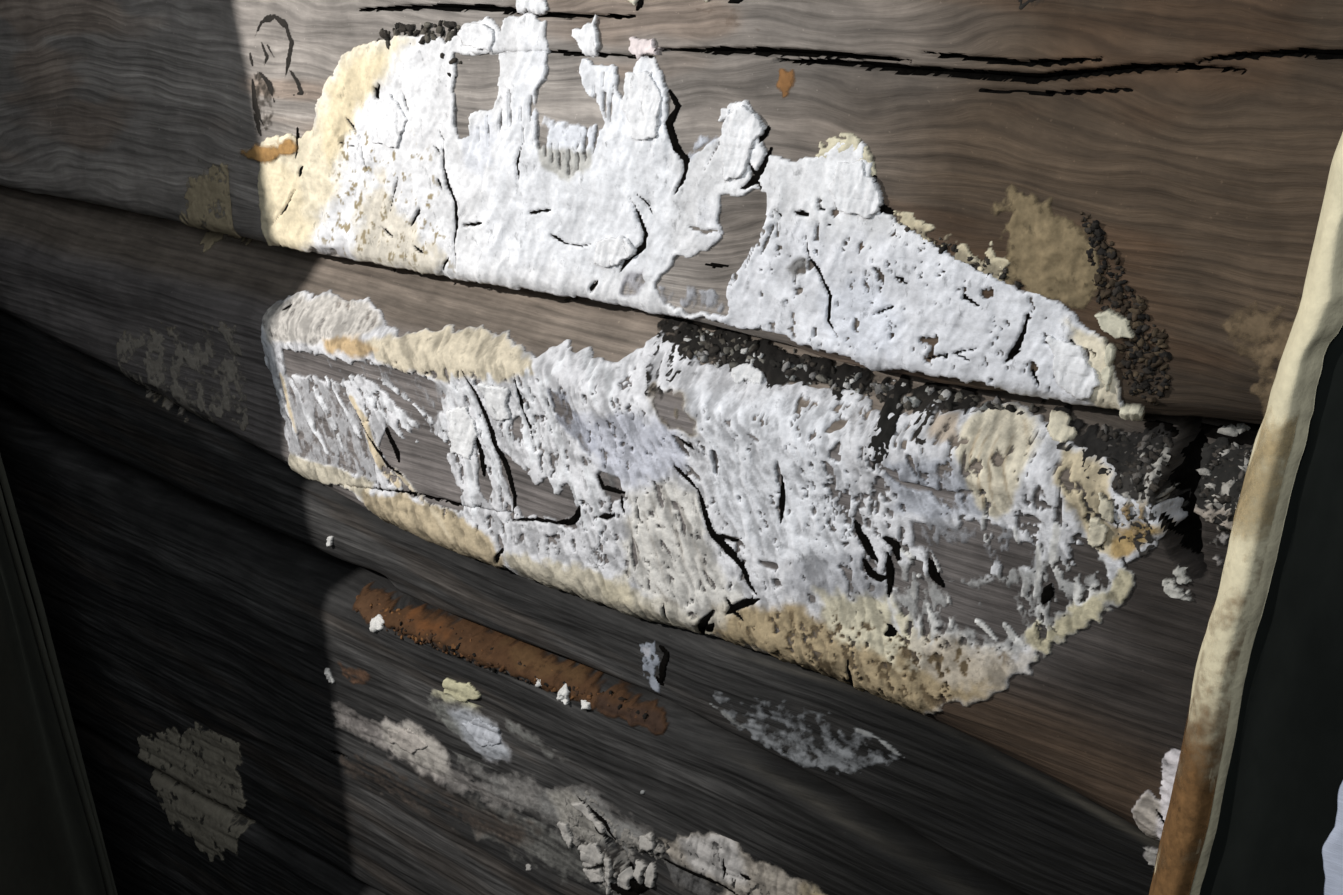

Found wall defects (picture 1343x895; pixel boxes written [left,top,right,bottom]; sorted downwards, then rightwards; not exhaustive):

crack [359,3,1343,97]
water stain [179,0,1296,716]
spalling [1177,132,1343,895]
peeling [369,614,384,633]
corrosion [353,583,667,735]
spalling [557,791,666,895]